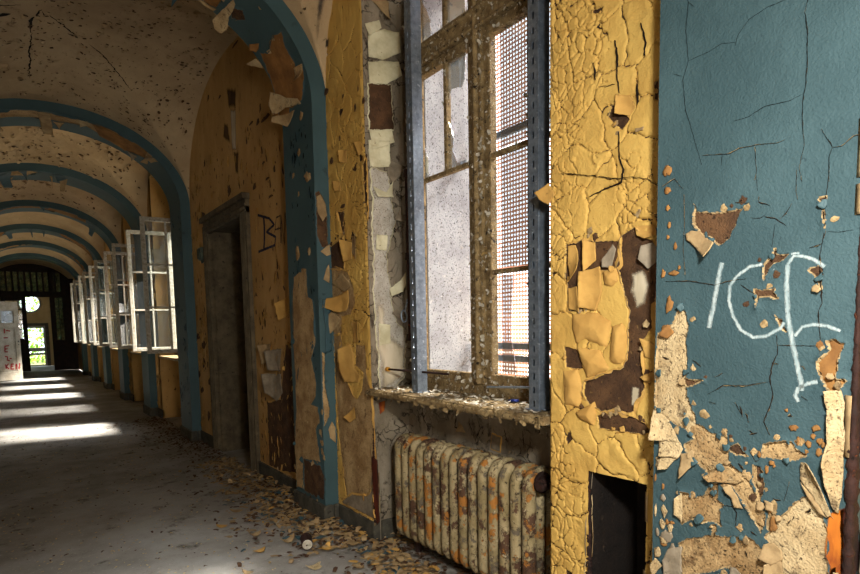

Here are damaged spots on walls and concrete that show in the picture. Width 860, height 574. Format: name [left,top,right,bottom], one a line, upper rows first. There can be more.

crack [0,5,131,90]
crack [592,40,639,104]
crack [639,23,647,56]
peeling [0,0,247,237]
crack [550,132,755,294]
crack [675,0,859,470]
peeling [562,196,846,574]
crack [721,505,756,574]
crack [773,481,811,524]